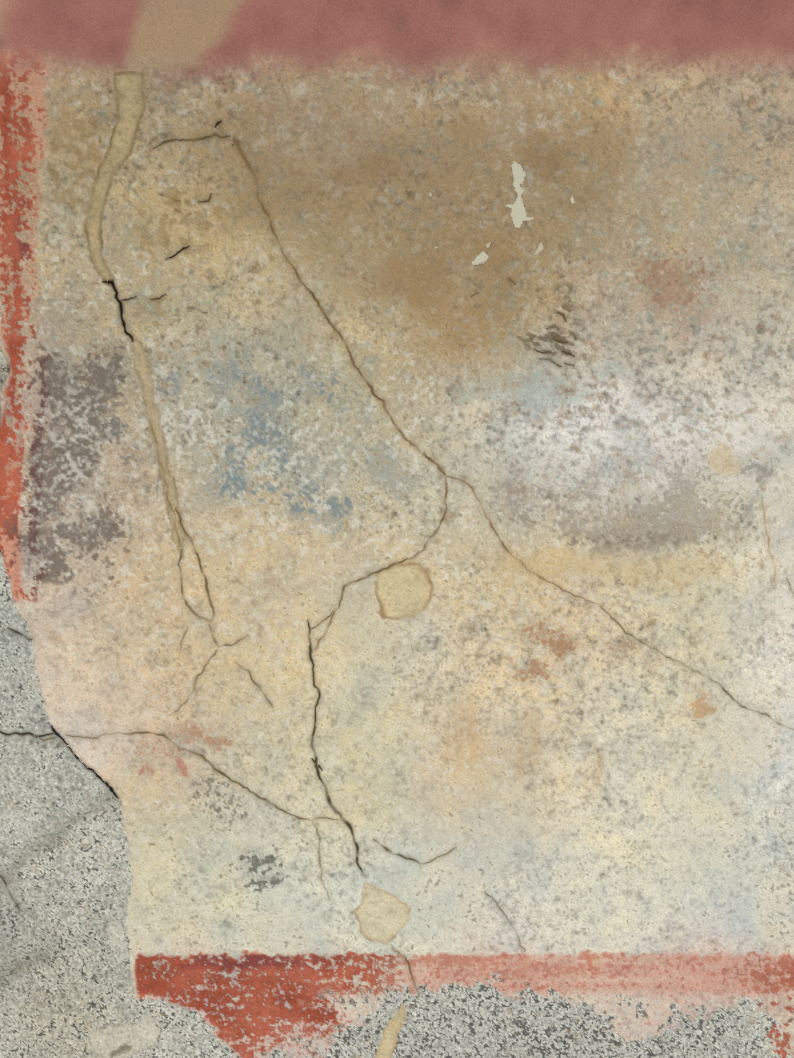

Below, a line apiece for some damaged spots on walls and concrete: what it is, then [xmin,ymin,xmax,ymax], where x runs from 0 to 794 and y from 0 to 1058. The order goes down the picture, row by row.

spalling [0,347,10,376]
spalling [480,289,606,370]
crack [0,118,794,902]
spalling [0,555,235,1058]
spalling [174,748,302,898]
crack [0,872,23,912]
crack [481,890,529,953]
crack [389,945,423,997]
spalling [324,982,792,1058]